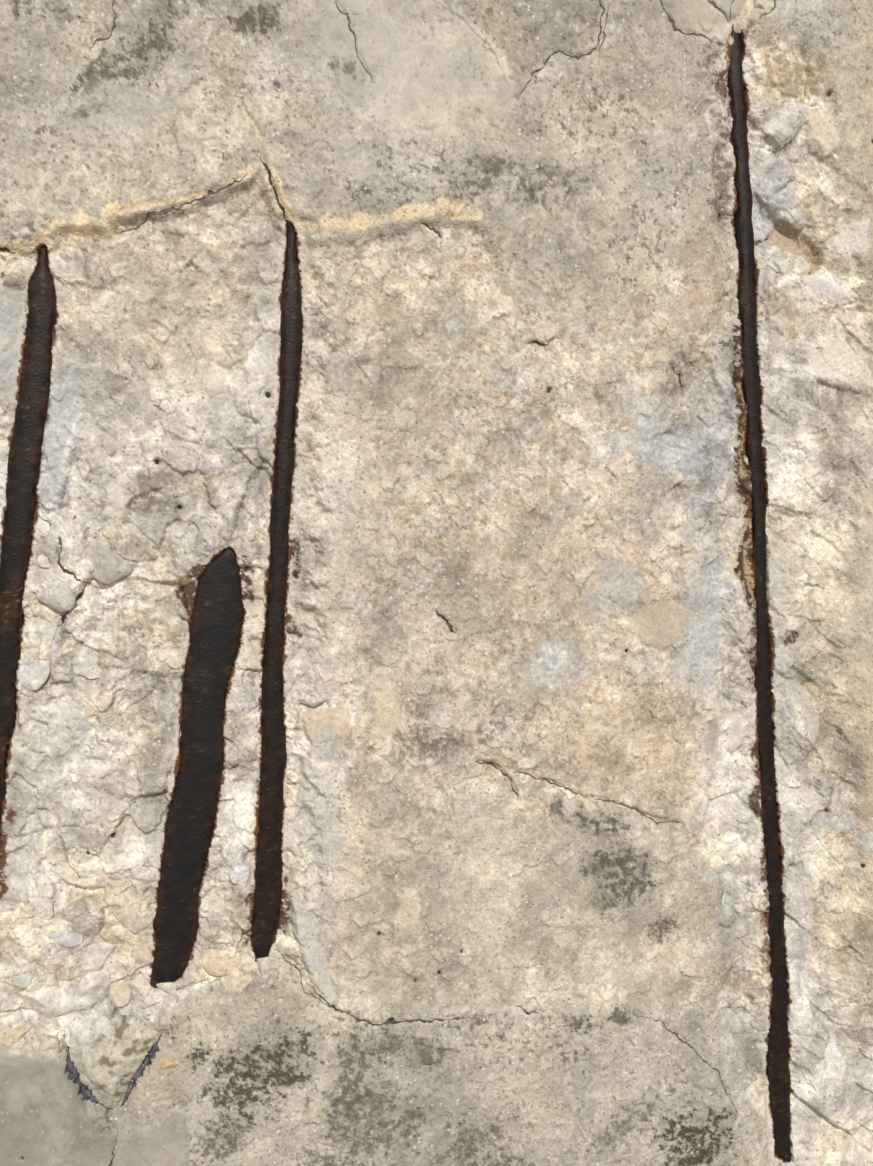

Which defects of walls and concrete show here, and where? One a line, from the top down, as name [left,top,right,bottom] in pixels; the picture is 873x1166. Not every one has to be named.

crack [115,156,286,233]
crack [518,1,610,98]
corrosion [712,25,751,283]
corrosion [0,389,51,899]
spalling [0,162,287,1112]
corrosion [175,405,279,981]
corrosion [282,361,302,736]
crack [273,948,483,1026]
spalling [232,37,775,1149]
crack [475,761,679,824]
corrosion [718,314,799,1163]
spalling [742,1,873,1166]